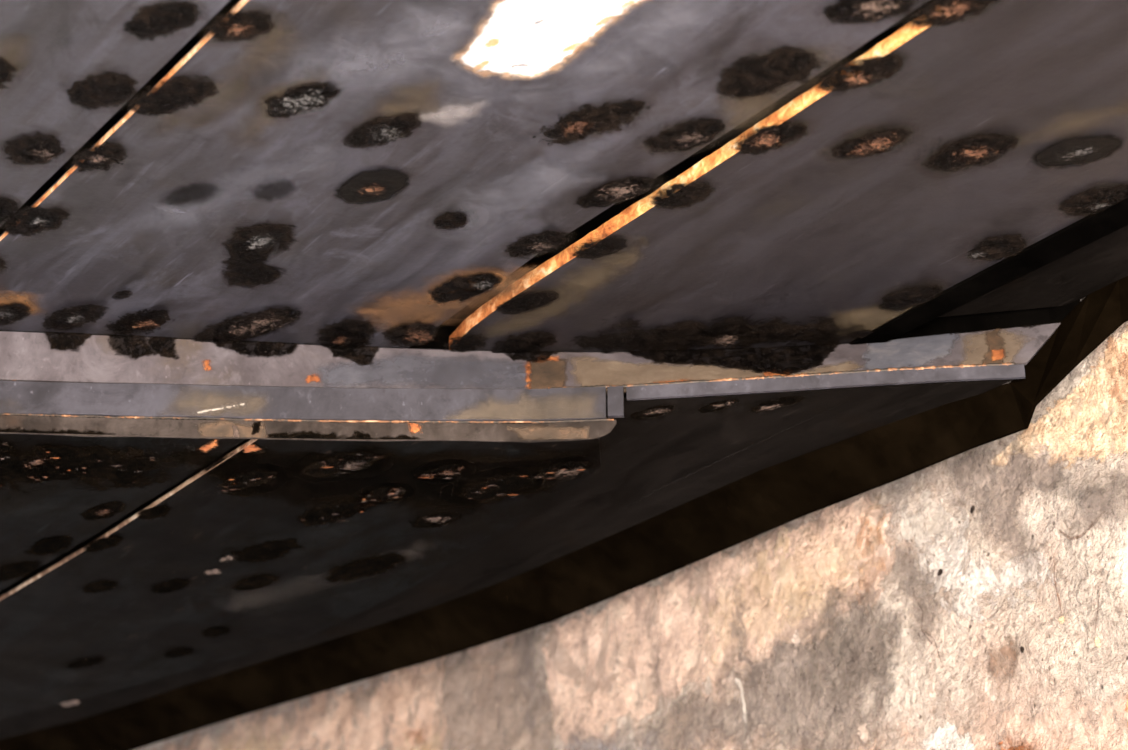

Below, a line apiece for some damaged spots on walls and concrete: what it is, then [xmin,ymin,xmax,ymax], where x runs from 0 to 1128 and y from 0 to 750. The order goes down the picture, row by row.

rust [932,1,971,16]
rust [565,121,588,135]
rust [752,132,780,148]
rust [852,137,893,156]
rust [953,149,988,162]
rust [0,293,38,313]
rust [360,270,531,343]
rust [491,254,635,334]
rust [983,329,1007,364]
rust [447,356,591,440]
rust [179,393,266,453]
rust [949,696,1128,750]